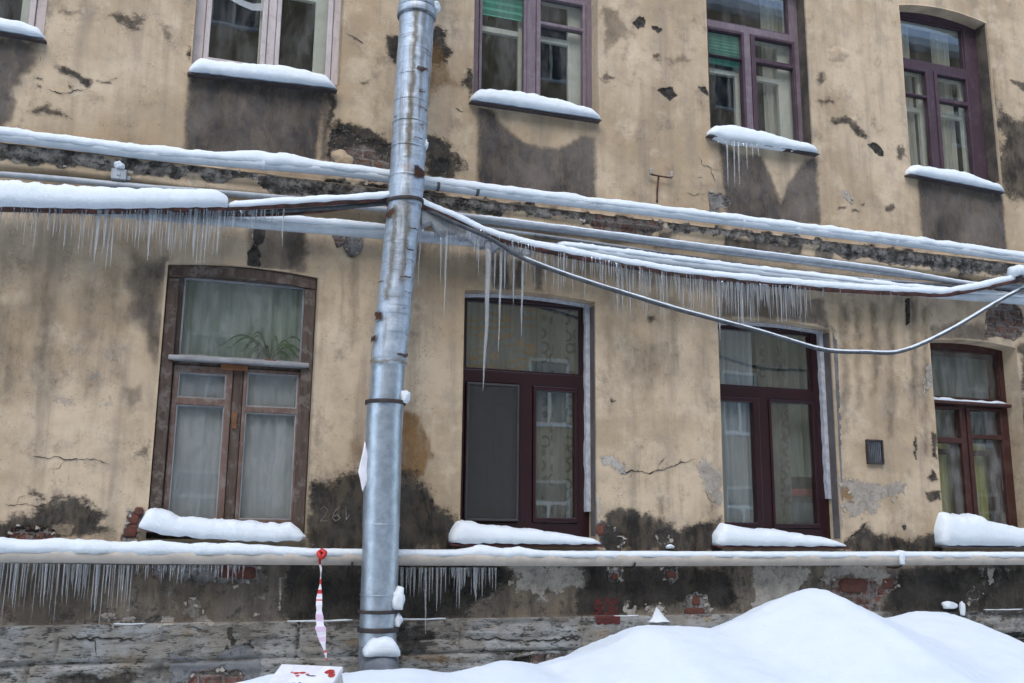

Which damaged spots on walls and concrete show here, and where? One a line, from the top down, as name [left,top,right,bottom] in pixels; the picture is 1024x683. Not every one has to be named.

spalling [657,87,677,100]
flaking render [327,126,391,169]
flaking render [984,303,1024,341]
crack [32,456,107,469]
crack [621,457,694,477]
flaking render [6,523,75,540]
water stain [0,489,109,540]
flaking render [120,507,144,542]
water stain [306,471,363,549]
water stain [399,469,460,549]
water stain [844,524,943,552]
peeling [749,565,900,615]